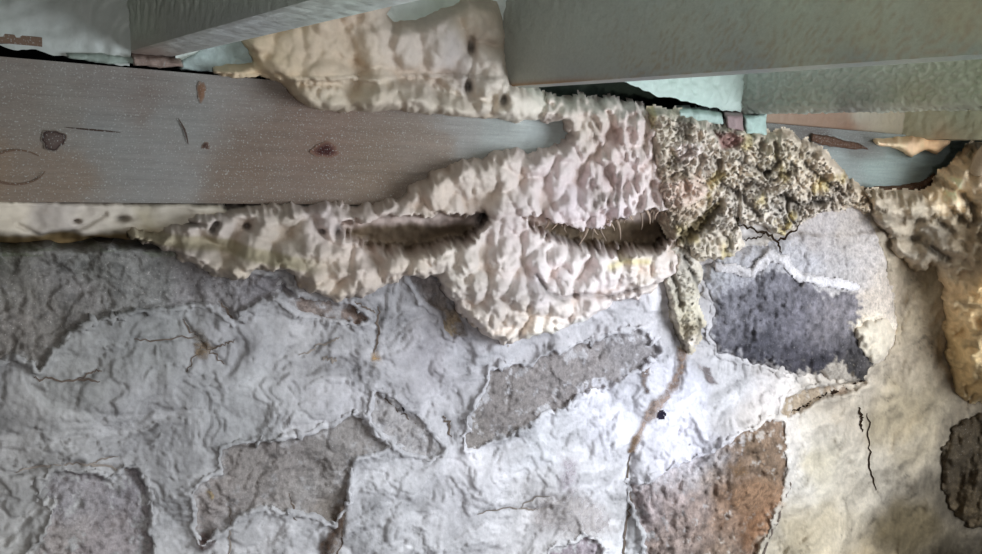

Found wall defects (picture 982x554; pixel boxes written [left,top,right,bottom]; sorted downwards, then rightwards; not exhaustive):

crack [737,224,800,253]
crack [791,380,877,490]